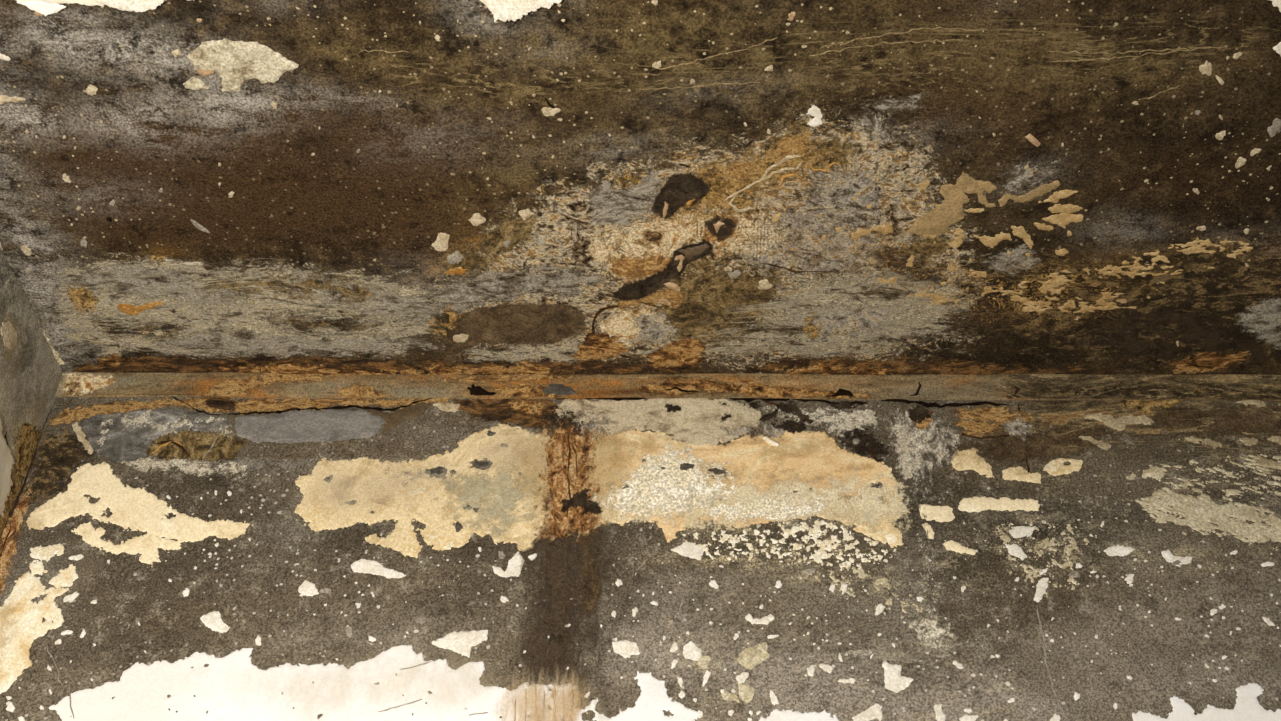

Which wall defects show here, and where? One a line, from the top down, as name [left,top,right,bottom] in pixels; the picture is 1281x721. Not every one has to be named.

water stain [809,26,988,56]
water stain [1047,46,1225,62]
water stain [52,93,1281,618]
rust [1168,351,1250,375]
water stain [24,422,95,503]
peeling [0,462,251,721]
peeling [294,423,560,561]
peeling [39,615,839,721]
water stain [506,526,606,721]
rust [0,331,1119,594]
peeling [584,428,1097,618]
peeling [1113,683,1281,721]